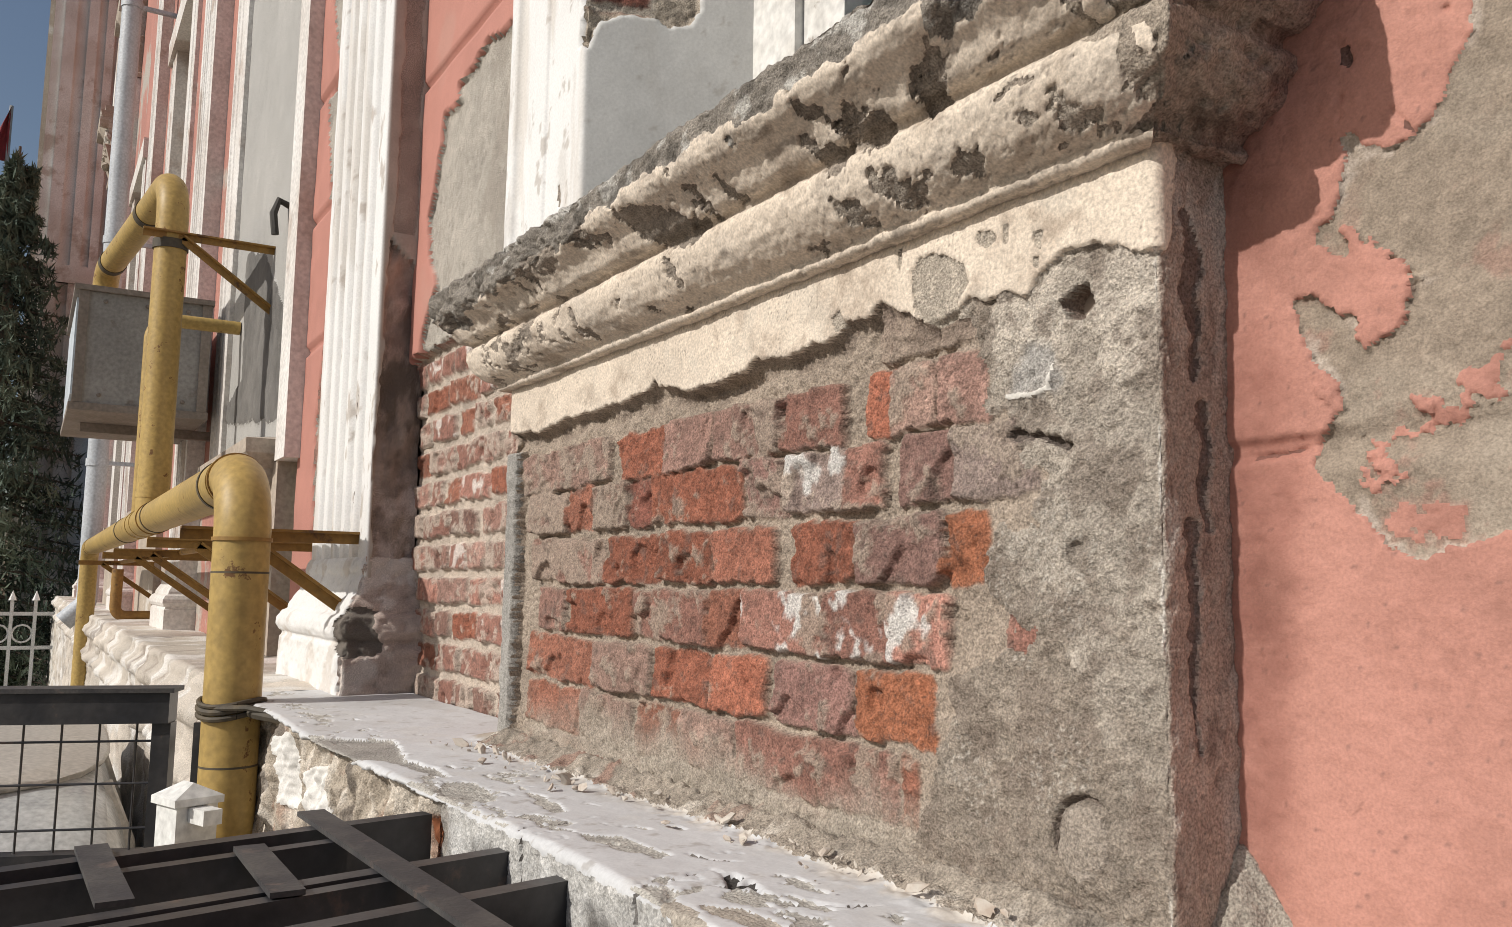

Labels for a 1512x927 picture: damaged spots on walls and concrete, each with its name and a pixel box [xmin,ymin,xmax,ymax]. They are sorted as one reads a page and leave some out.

flaking render [1292,0,1512,561]
flaking render [332,0,1054,852]
crack [1006,430,1074,450]
peeling [266,692,832,927]
peeling [882,914,905,925]